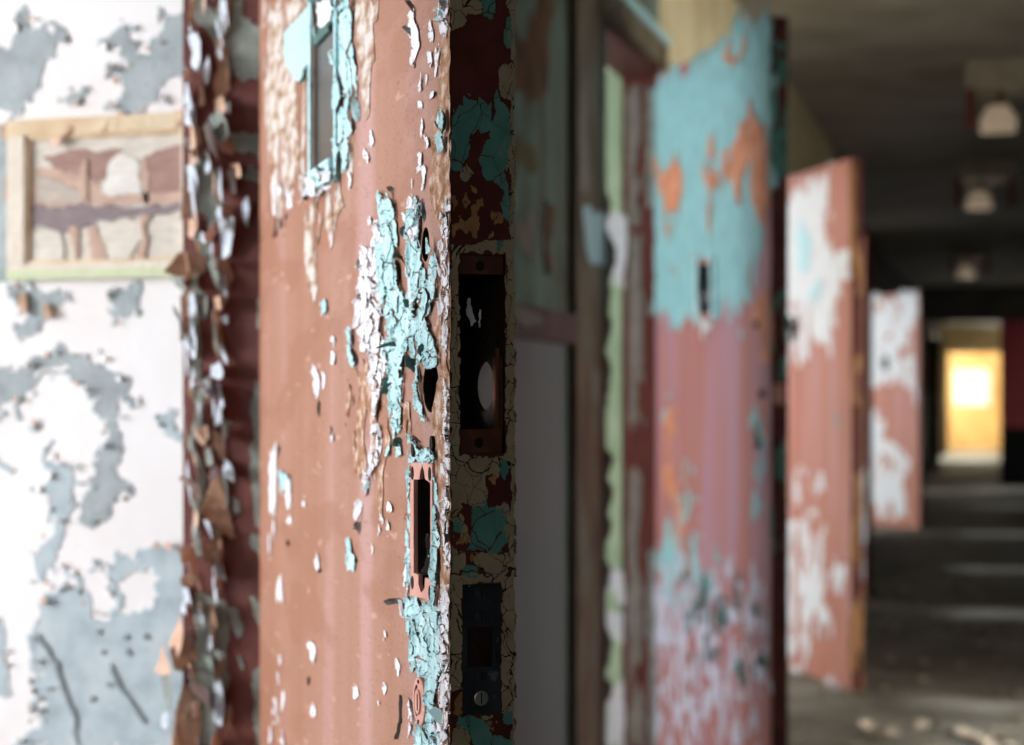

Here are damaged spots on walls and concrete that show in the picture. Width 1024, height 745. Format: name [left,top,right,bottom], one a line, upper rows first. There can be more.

peeling [0,0,379,745]
peeling [311,0,544,745]
peeling [578,1,918,745]